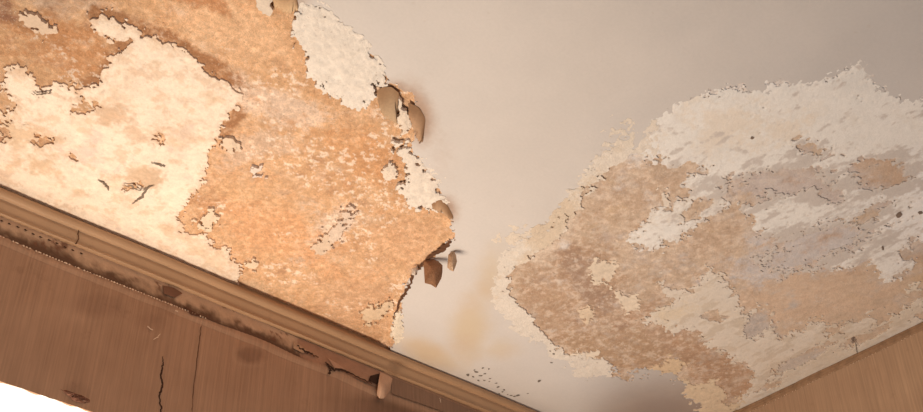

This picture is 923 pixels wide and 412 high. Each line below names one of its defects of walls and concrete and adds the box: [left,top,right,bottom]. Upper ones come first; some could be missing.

flaking render [0,0,457,350]
peeling [490,59,923,412]
water stain [32,271,218,358]
crack [157,357,165,412]
crack [192,326,202,408]